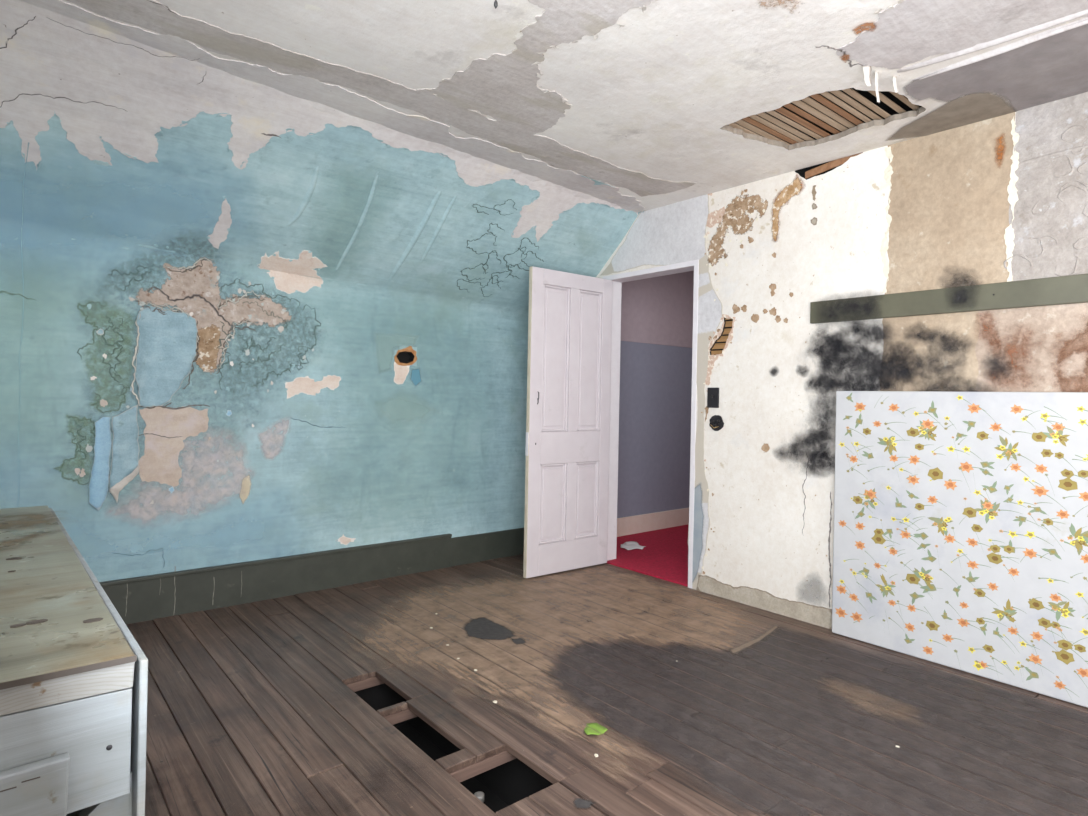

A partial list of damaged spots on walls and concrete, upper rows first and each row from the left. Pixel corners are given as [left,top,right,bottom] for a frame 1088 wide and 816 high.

crack [0,16,206,84]
crack [1,94,126,111]
peeling [0,0,696,242]
flaking render [704,189,768,275]
flaking render [880,112,1015,294]
flaking render [129,195,328,389]
water stain [952,275,973,305]
spalling [394,346,421,386]
water stain [779,299,978,473]
water stain [981,315,1031,384]
water stain [1057,328,1088,392]
water stain [551,626,1088,816]